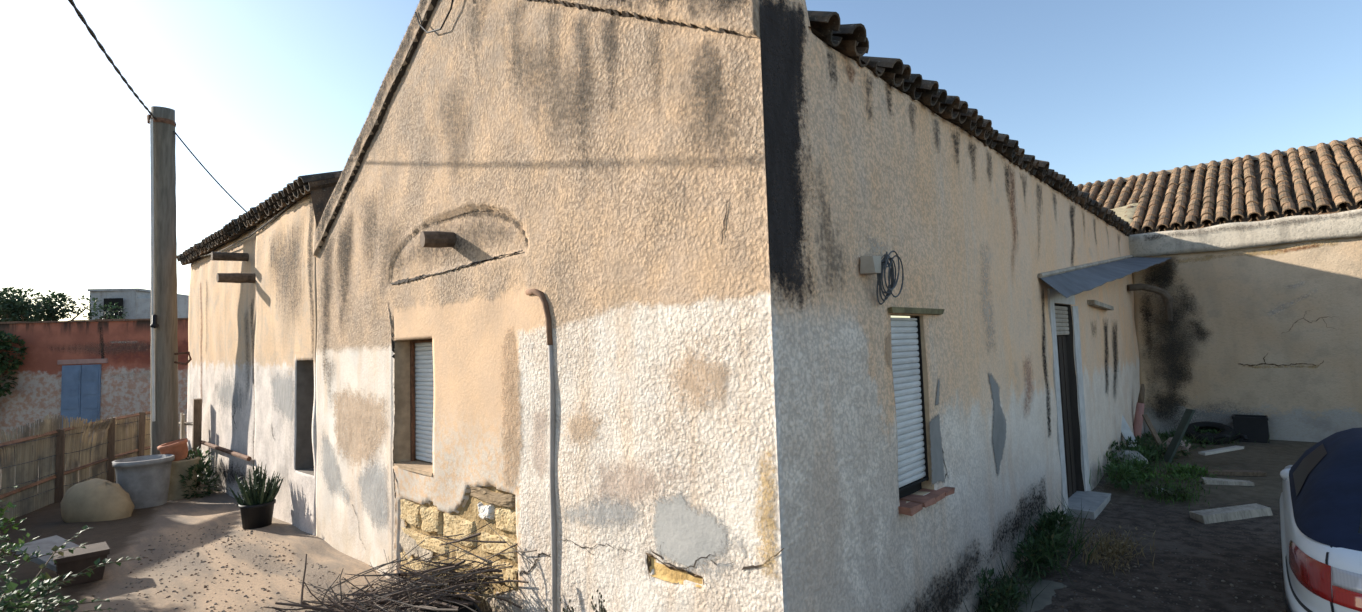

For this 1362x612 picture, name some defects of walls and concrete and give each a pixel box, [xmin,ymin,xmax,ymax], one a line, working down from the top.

water stain [573,0,668,144]
water stain [269,0,426,359]
water stain [689,0,813,308]
water stain [935,120,1075,265]
water stain [1041,293,1051,435]
water stain [1104,323,1119,393]
water stain [1142,260,1245,433]
crack [1239,309,1335,368]
spalling [400,330,522,597]
crack [517,539,784,576]
spalling [646,553,704,588]
water stain [907,481,1047,612]